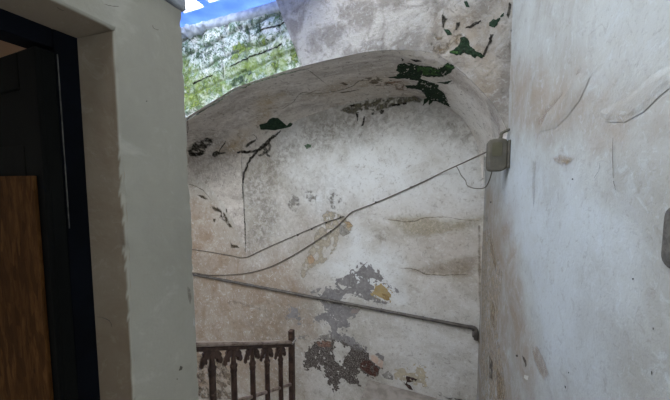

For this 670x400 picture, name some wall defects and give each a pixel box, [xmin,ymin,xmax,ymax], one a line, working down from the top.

crack [237,130,281,196]
flaking render [301,193,353,278]
flaking render [298,262,429,392]